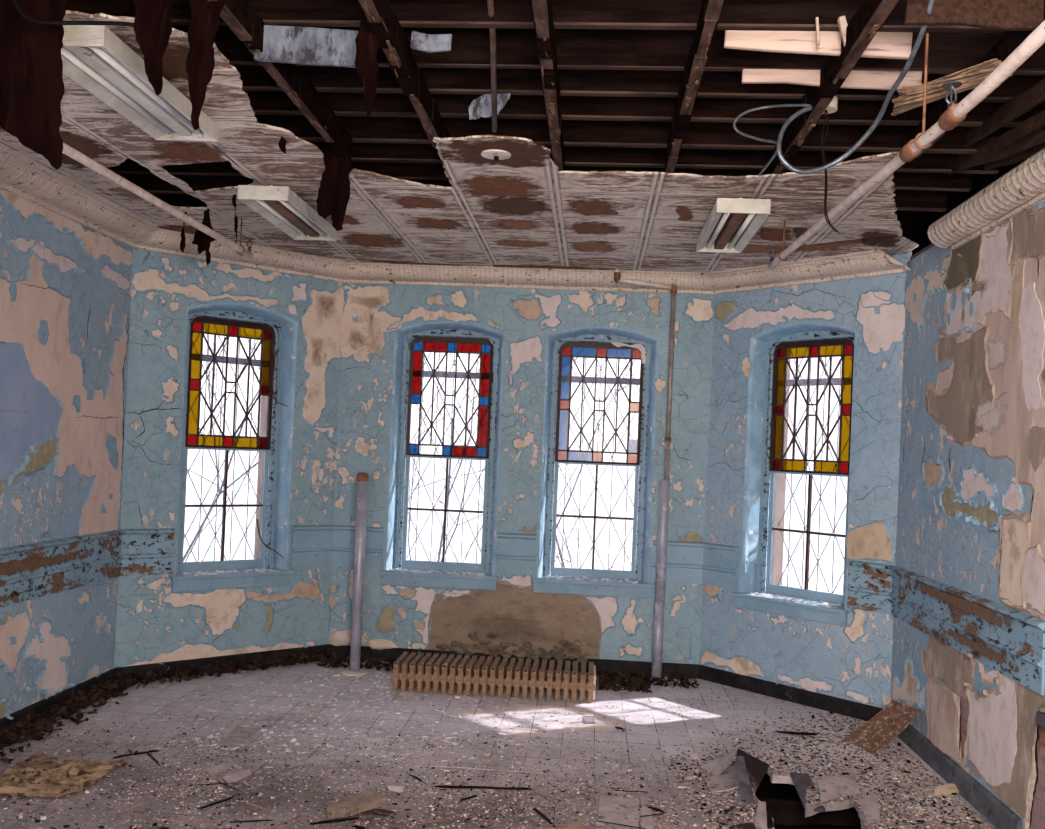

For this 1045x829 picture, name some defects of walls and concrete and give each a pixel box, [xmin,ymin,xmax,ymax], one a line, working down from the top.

crack [78,330,180,471]
peeling [0,188,501,576]
peeling [845,206,1045,627]
spalling [375,574,652,662]
peeling [891,618,1045,820]